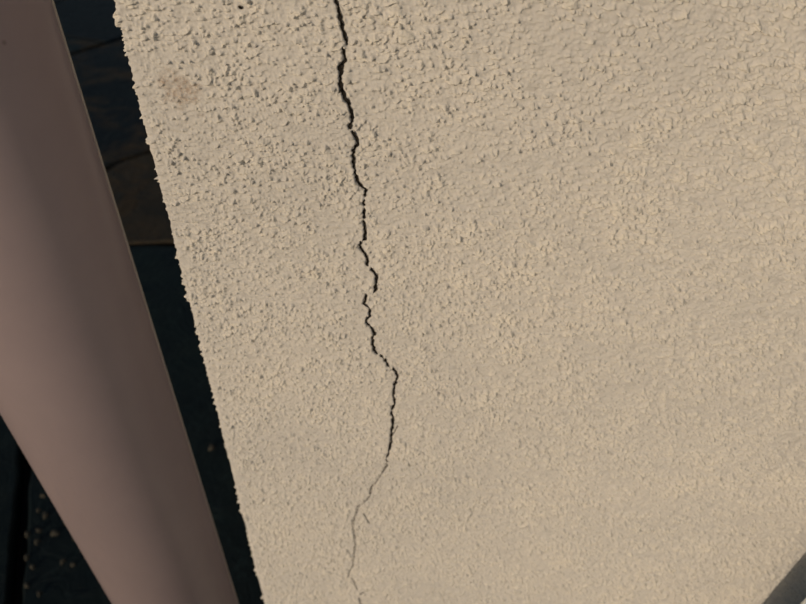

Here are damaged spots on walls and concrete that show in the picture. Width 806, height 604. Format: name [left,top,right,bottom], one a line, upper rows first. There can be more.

crack [334,0,398,604]